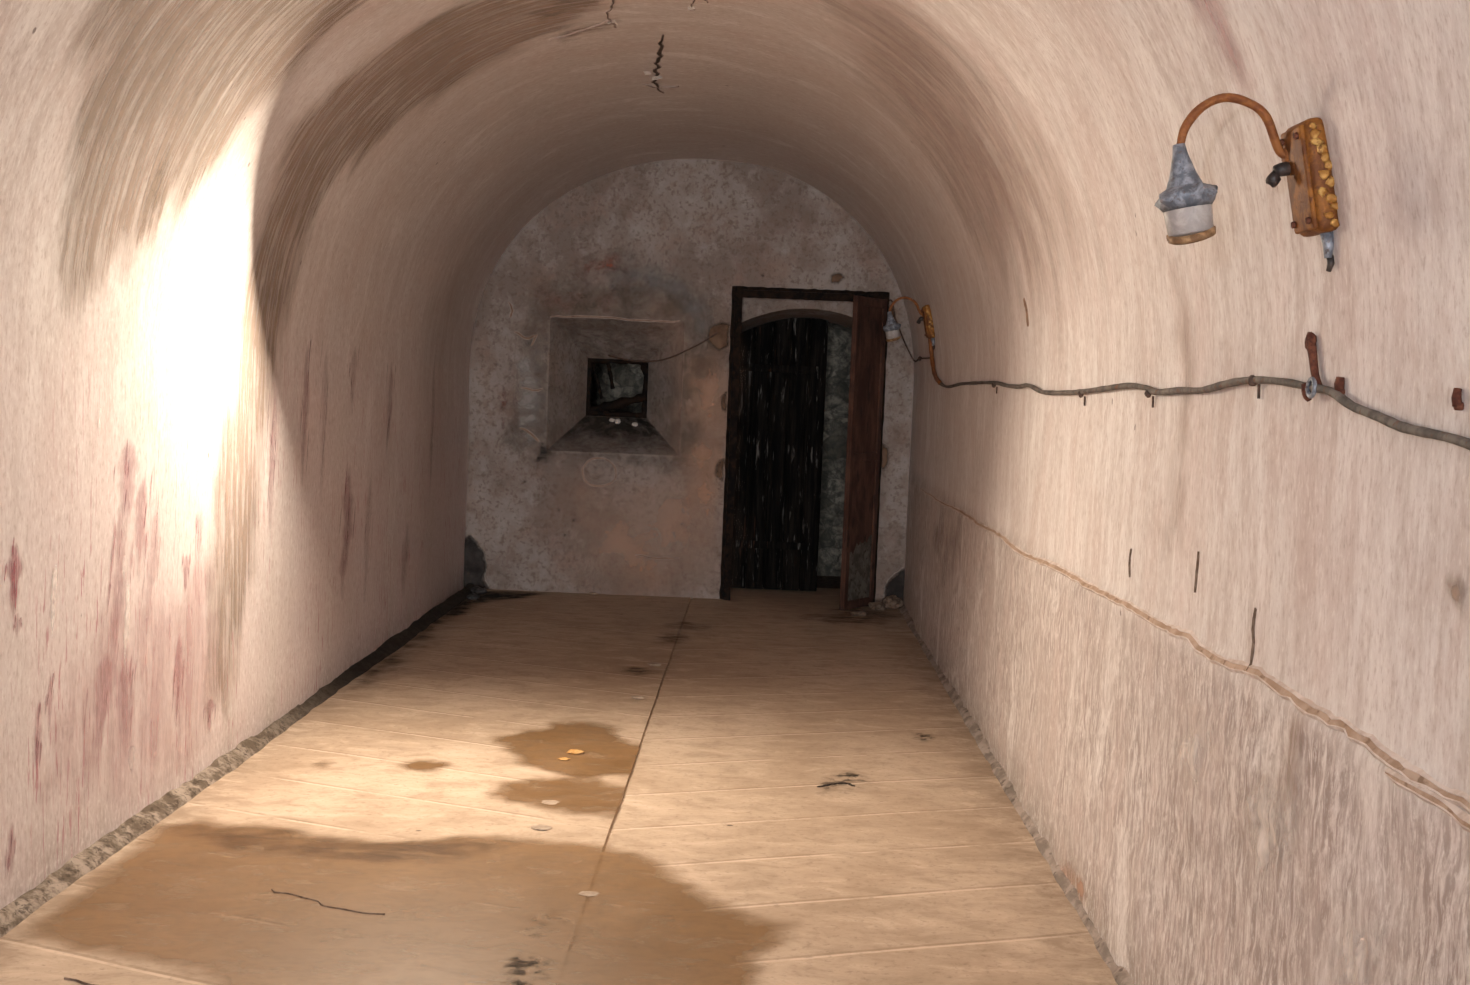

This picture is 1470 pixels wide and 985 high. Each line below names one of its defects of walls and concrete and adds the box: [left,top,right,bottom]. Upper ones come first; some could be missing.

damp [62,0,362,287]
damp [216,0,606,691]
corrosion [4,541,19,620]
damp [45,824,774,985]
damp [495,723,640,813]
crack [920,488,1470,833]